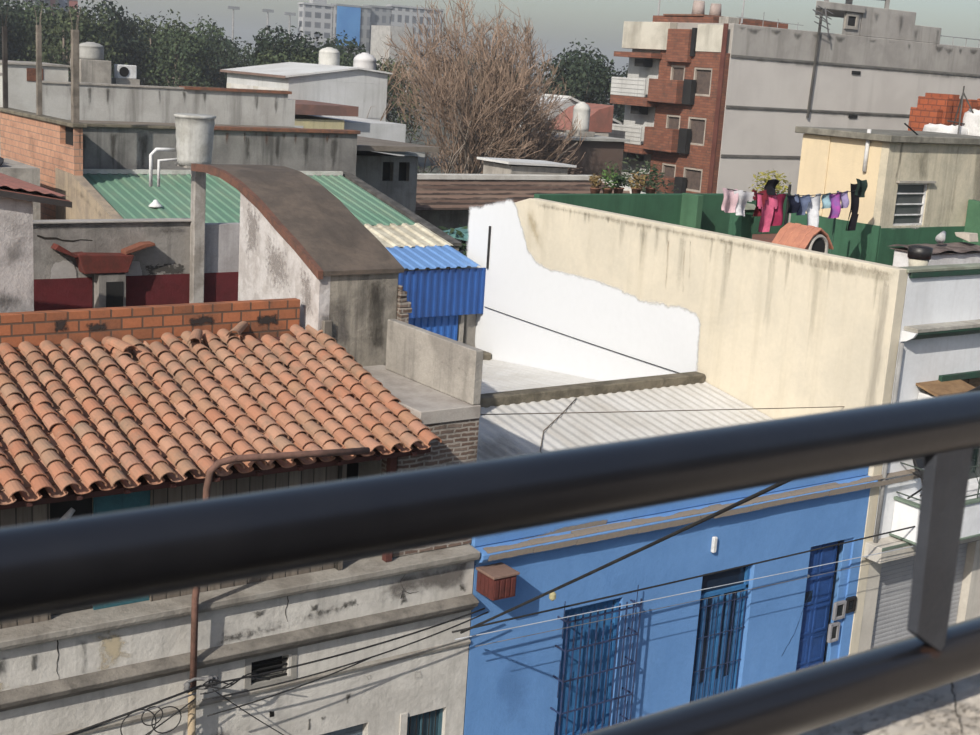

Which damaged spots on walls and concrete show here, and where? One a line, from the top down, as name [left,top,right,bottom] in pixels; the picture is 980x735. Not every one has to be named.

leakage [391,564,466,603]
crack [951,682,963,735]